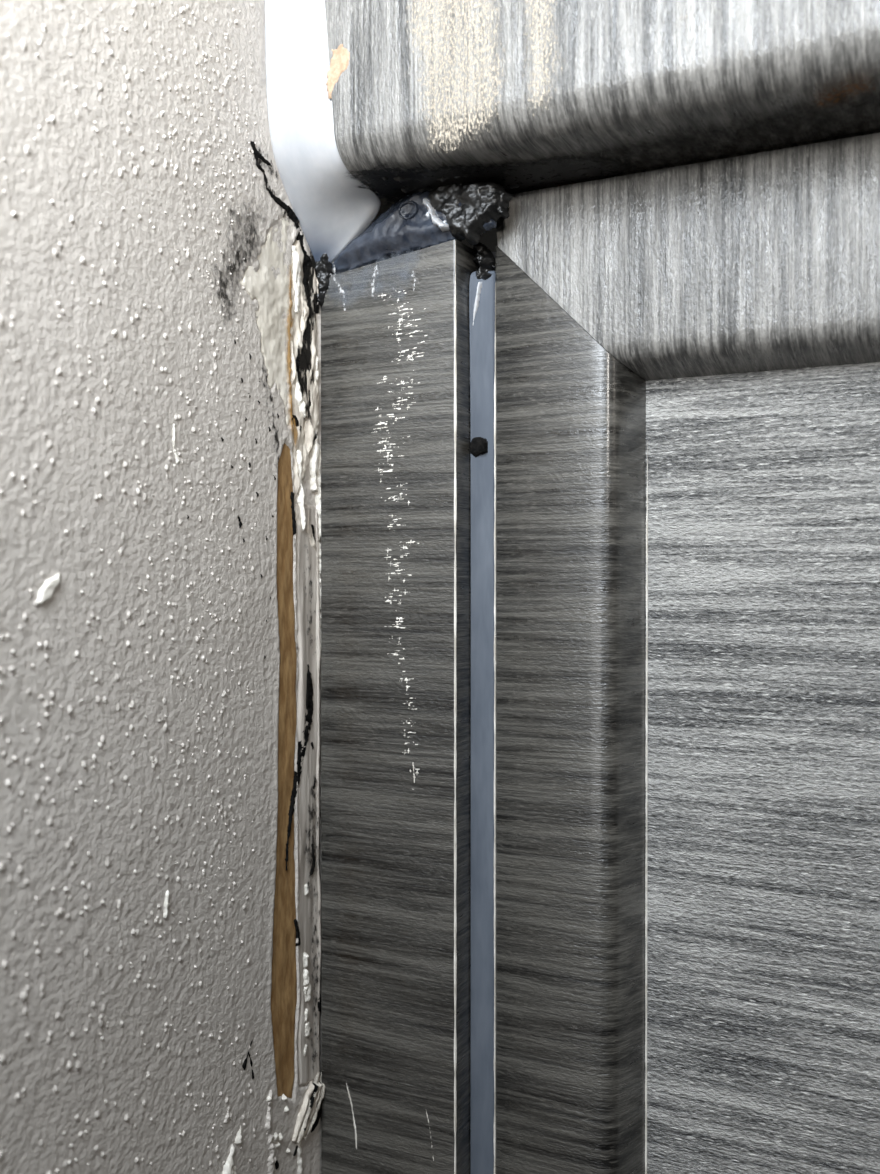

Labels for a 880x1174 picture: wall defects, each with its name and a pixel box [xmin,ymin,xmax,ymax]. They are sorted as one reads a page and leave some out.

water stain [215,208,259,319]
crack [250,141,320,387]
water stain [249,354,279,462]
crack [292,415,305,433]
peeling [239,217,325,1156]